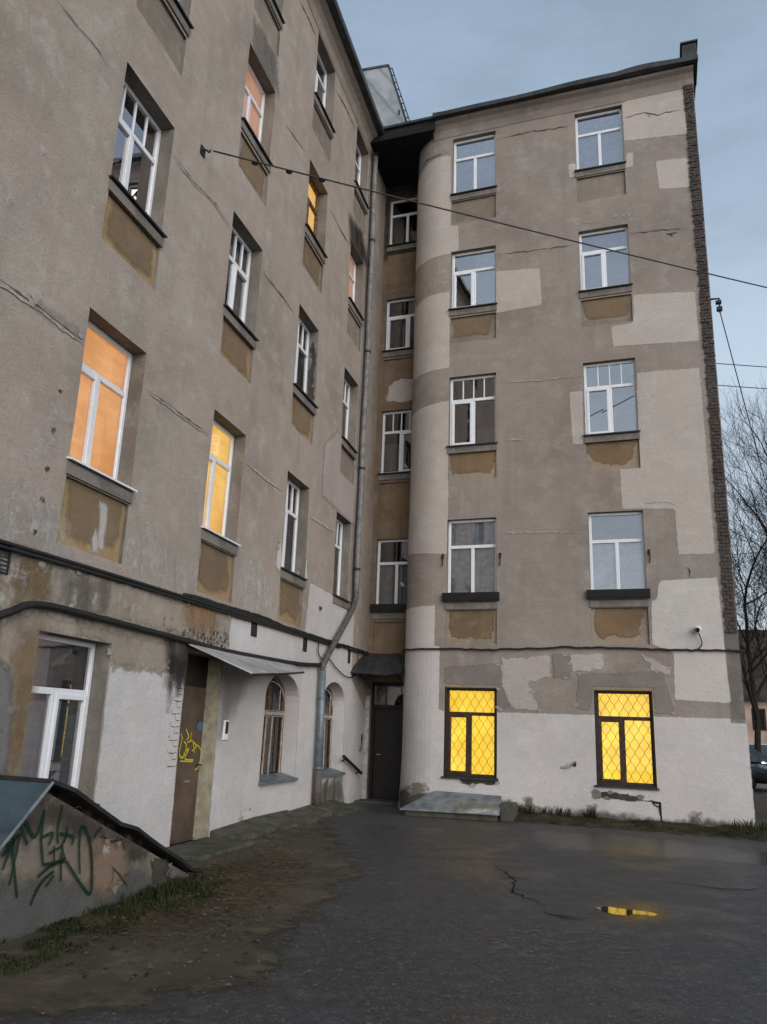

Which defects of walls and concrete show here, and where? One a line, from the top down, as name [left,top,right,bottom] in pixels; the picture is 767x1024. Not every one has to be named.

crack [0,279,81,342]
peeling [444,652,675,715]
spalling [592,789,645,802]